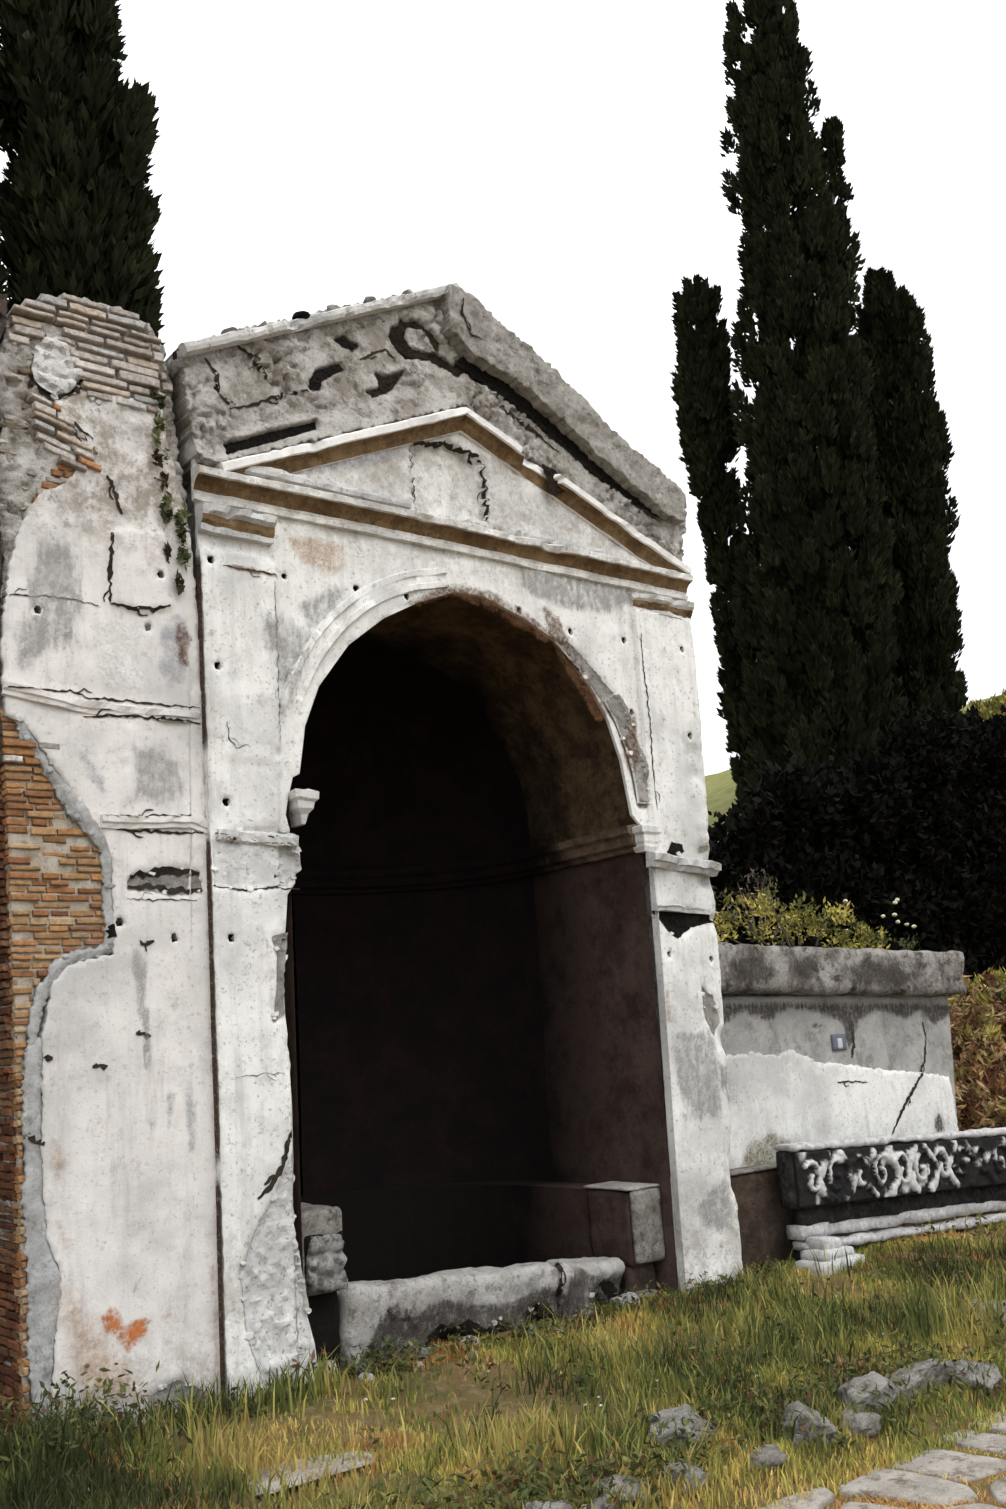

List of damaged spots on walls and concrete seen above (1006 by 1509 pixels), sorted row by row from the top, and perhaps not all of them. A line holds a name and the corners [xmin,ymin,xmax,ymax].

spalling [6,293,173,503]
spalling [0,709,302,1436]
crack [257,1132,292,1200]
crack [892,1022,927,1134]
rust [102,1310,147,1349]
spalling [238,1162,316,1384]